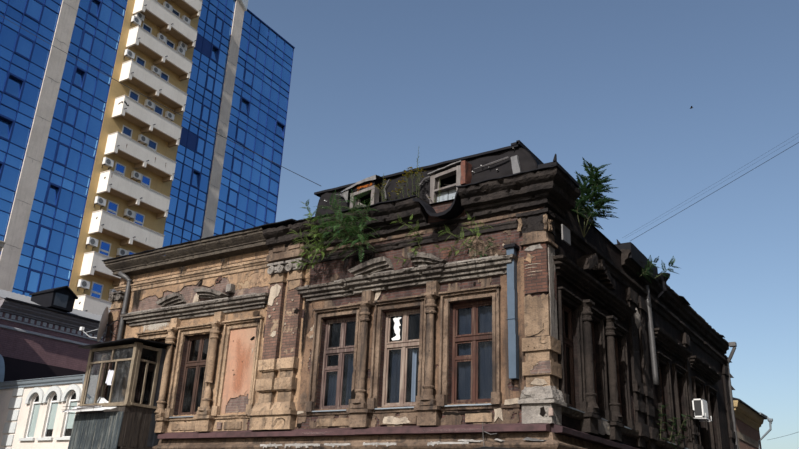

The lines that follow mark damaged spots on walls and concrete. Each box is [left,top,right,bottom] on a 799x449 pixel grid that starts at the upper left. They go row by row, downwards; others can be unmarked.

flaking render [132,272,269,312]
spalling [226,393,249,413]